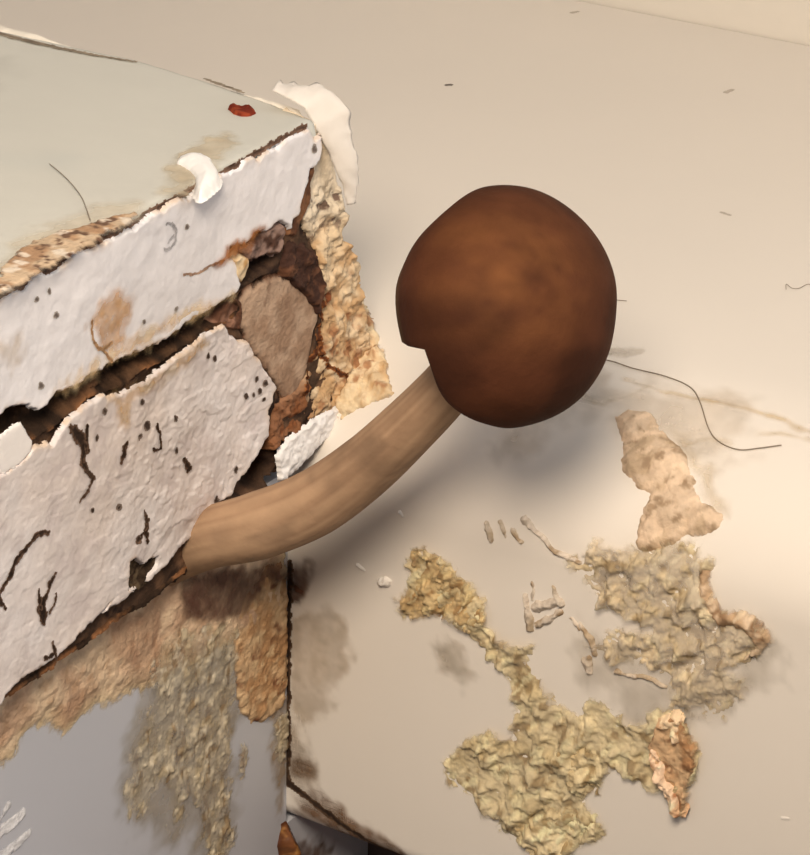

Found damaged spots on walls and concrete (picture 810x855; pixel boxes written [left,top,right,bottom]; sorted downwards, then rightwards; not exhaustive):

peeling [177,152,223,203]
peeling [0,212,137,293]
spalling [203,80,394,450]
peeling [0,422,32,474]
crack [0,296,240,504]
crack [0,529,51,611]
crack [5,567,187,698]
crack [136,510,150,544]
peeling [0,553,289,855]
leakage [126,642,237,817]
flaking render [399,515,770,855]
leakage [0,801,31,855]